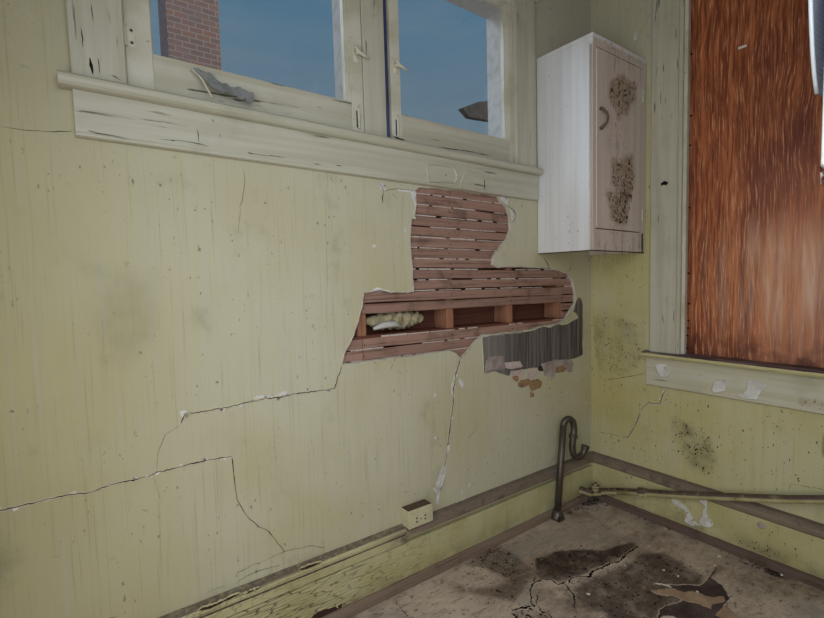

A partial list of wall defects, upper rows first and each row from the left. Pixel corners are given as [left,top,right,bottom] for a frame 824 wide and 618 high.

flaking render [342,186,583,397]
crack [438,358,470,491]
crack [602,388,667,439]
peeling [737,379,768,400]
crack [0,364,343,591]
peeling [670,498,715,529]
peeling [309,602,347,618]
crack [510,546,639,618]
damp [465,539,701,618]